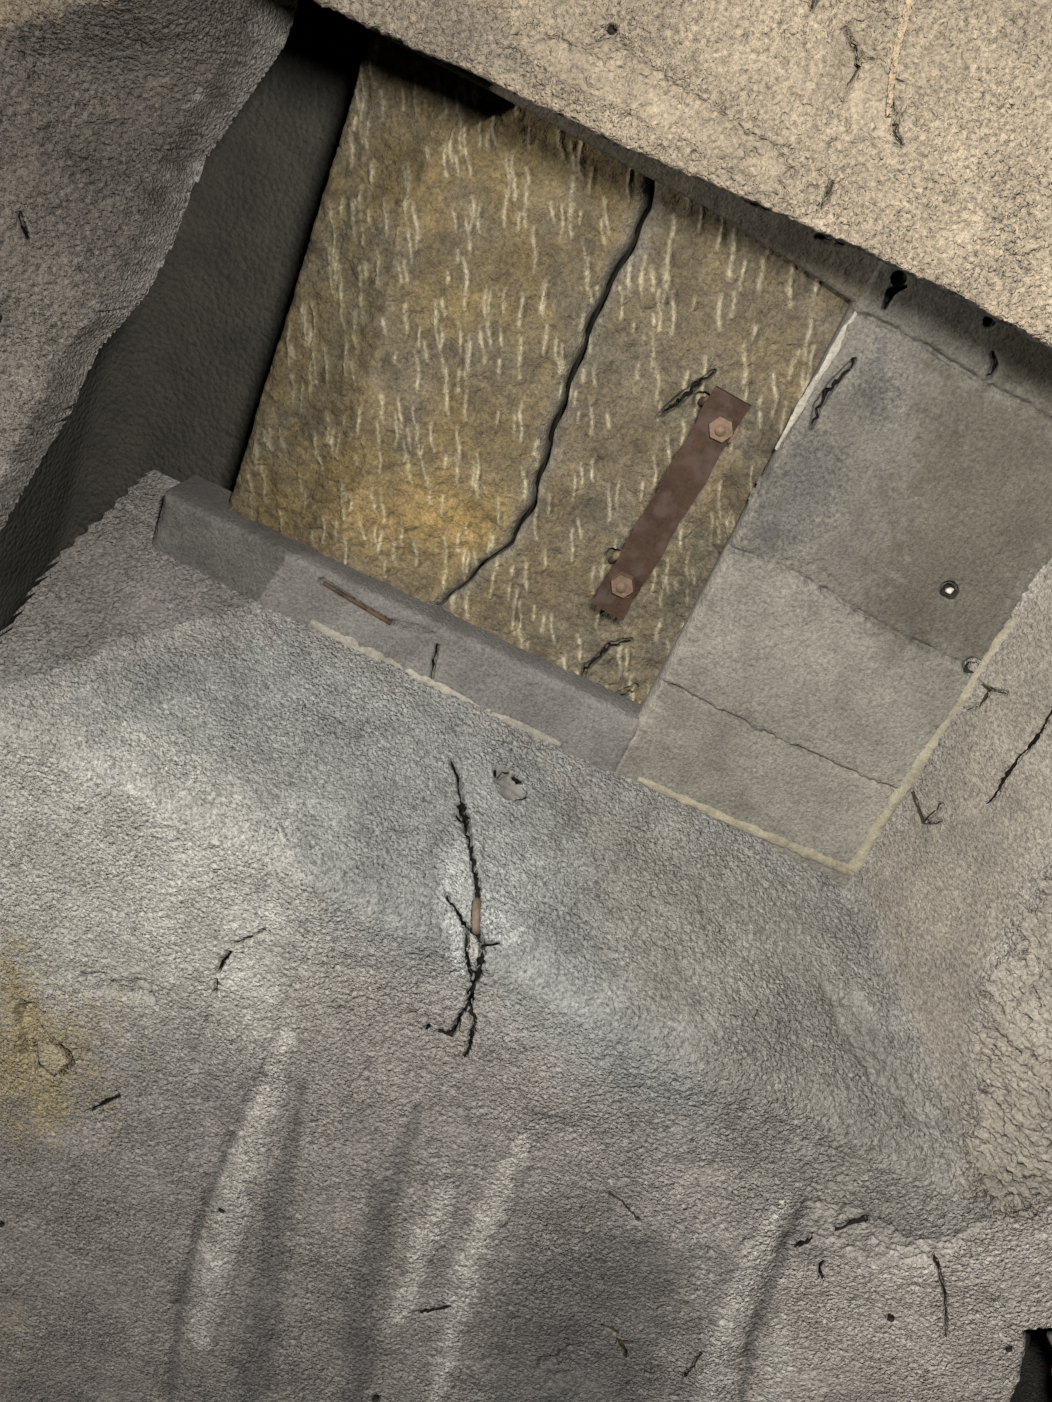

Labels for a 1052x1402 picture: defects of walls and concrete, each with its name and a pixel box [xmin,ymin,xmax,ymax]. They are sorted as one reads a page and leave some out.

crack [844,40,875,98]
crack [459,182,654,588]
crack [493,770,527,801]
crack [986,709,1052,804]
crack [425,761,500,1057]